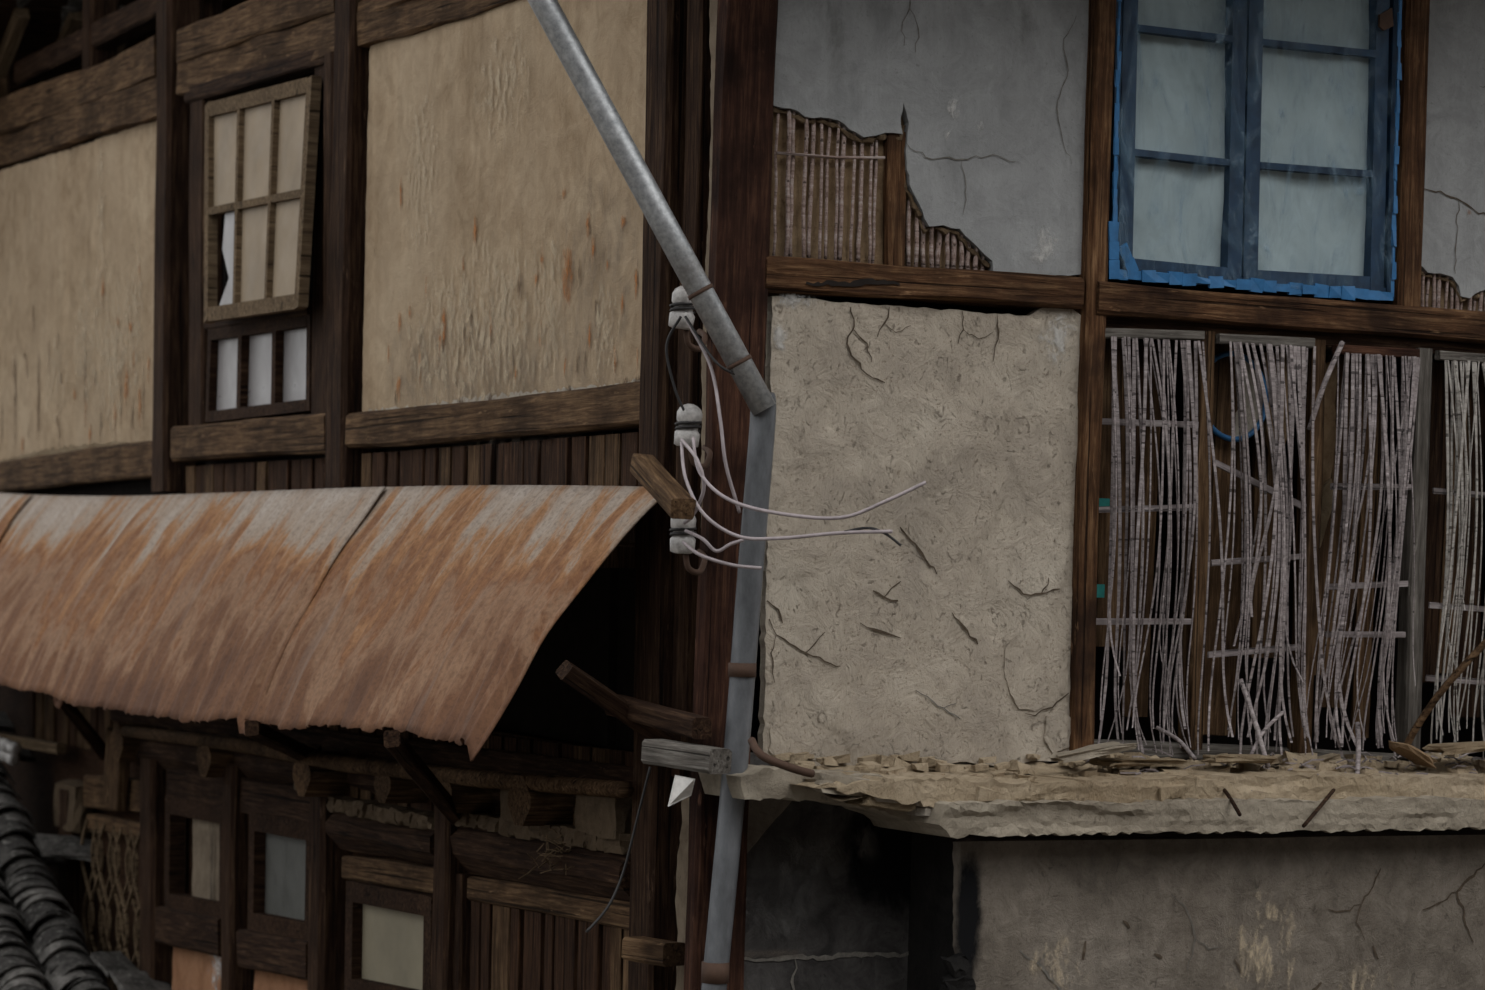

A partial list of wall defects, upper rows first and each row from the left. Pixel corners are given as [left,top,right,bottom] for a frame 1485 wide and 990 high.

spalling [769,107,990,271]
crack [907,144,1016,213]
crack [1426,189,1485,270]
spalling [1420,271,1485,312]
crack [846,307,911,383]
crack [958,311,1000,360]
crack [860,527,937,638]
crack [1008,578,1060,596]
crack [767,600,840,682]
crack [952,612,978,644]
crack [1422,863,1485,943]
spalling [940,953,976,990]